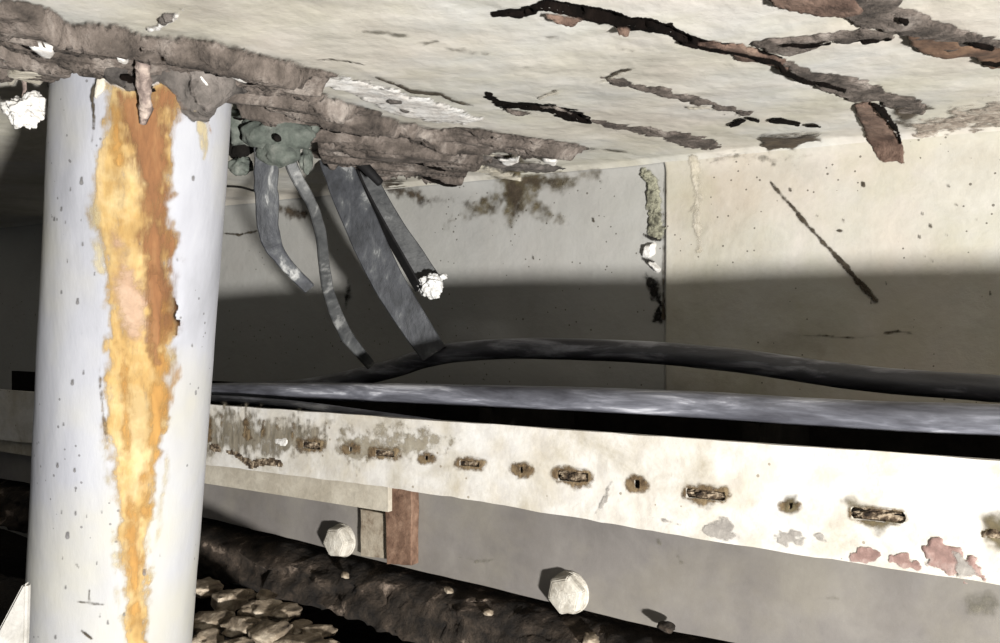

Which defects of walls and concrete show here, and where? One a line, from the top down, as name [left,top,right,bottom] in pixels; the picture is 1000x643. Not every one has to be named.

spalling [0,0,594,187]
crack [330,59,722,150]
crack [491,0,927,164]
water stain [384,179,429,204]
crack [771,182,878,303]
rust [93,83,181,643]
water stain [243,418,265,441]
water stain [336,422,453,463]
rust [686,485,726,506]
peeling [703,517,736,541]
rust [848,501,906,530]
peeling [850,537,986,584]